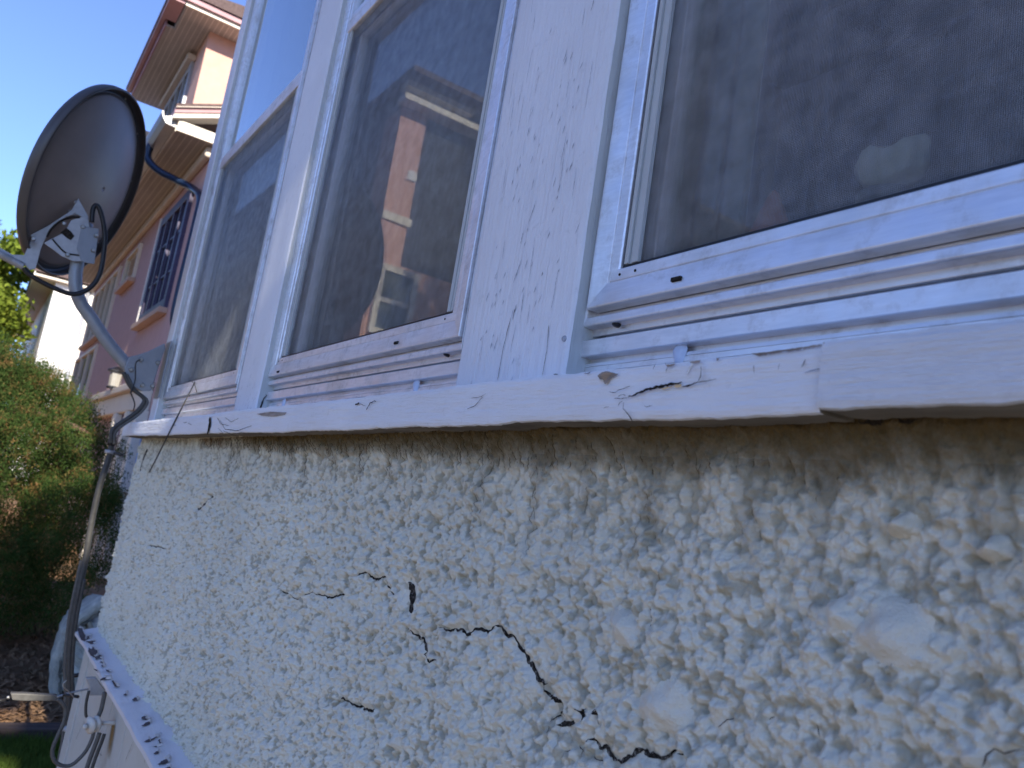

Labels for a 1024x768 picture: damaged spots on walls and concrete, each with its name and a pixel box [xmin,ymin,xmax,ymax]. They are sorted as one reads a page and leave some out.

peeling [598,371,618,384]
crack [604,365,714,422]
peeling [78,626,140,701]
crack [283,572,565,732]
peeling [141,714,172,768]
crack [567,738,684,764]